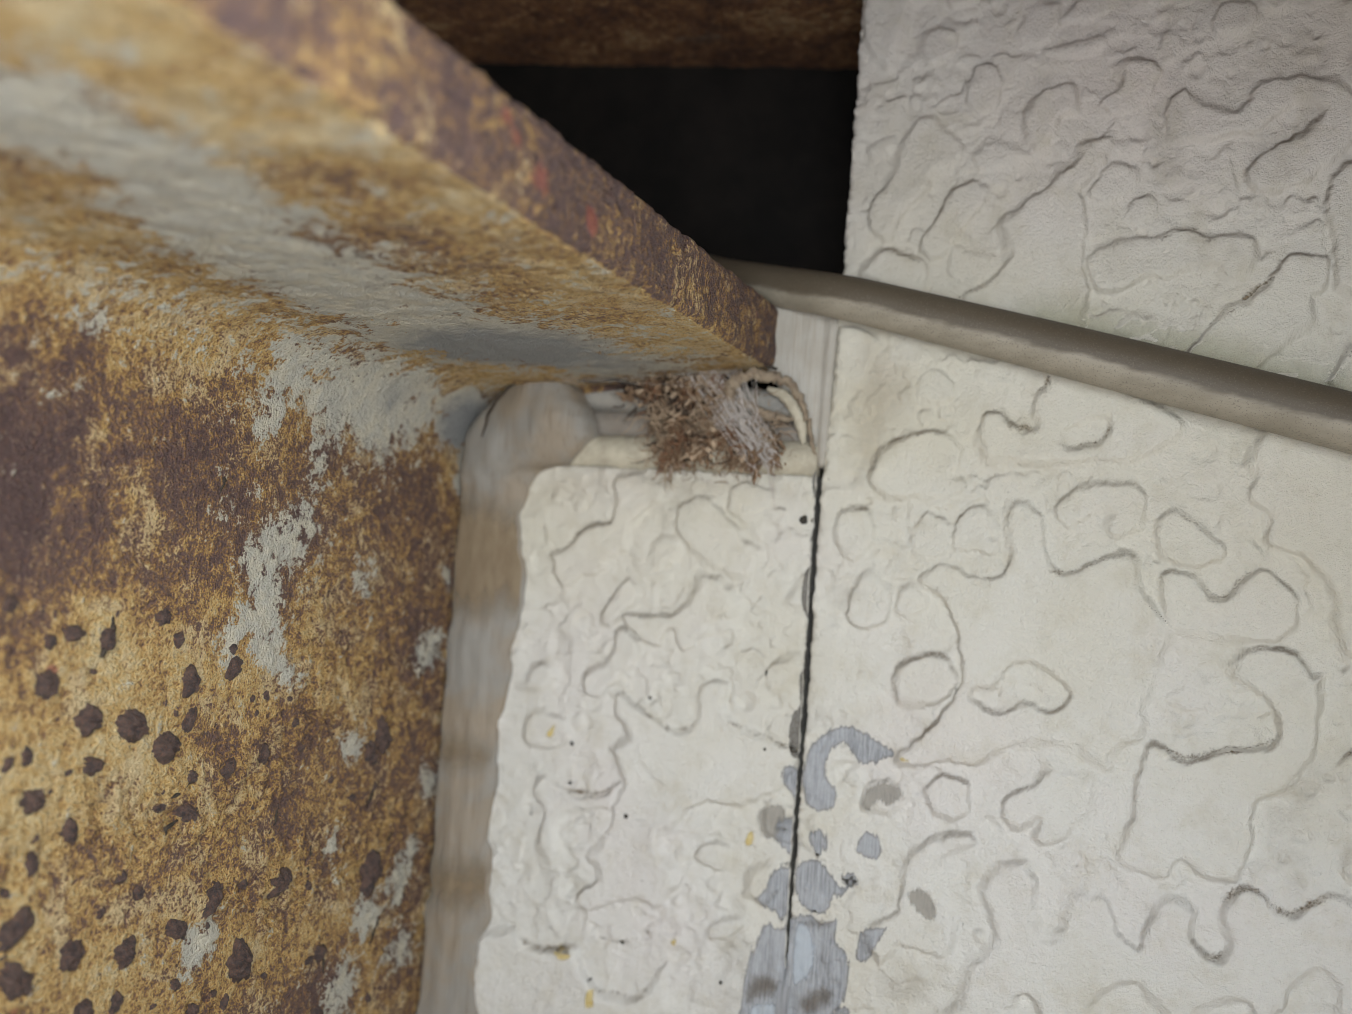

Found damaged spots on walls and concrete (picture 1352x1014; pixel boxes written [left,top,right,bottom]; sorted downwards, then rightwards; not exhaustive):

corrosion [454,507,522,607]
corrosion [41,608,120,651]
corrosion [35,668,61,700]
corrosion [72,664,202,765]
corrosion [18,788,53,815]
peeling [863,782,901,811]
peeling [739,673,894,1014]
corrosion [165,879,248,940]
corrosion [0,888,35,1002]
corrosion [58,939,86,972]
corrosion [113,935,137,970]
corrosion [185,937,267,1014]